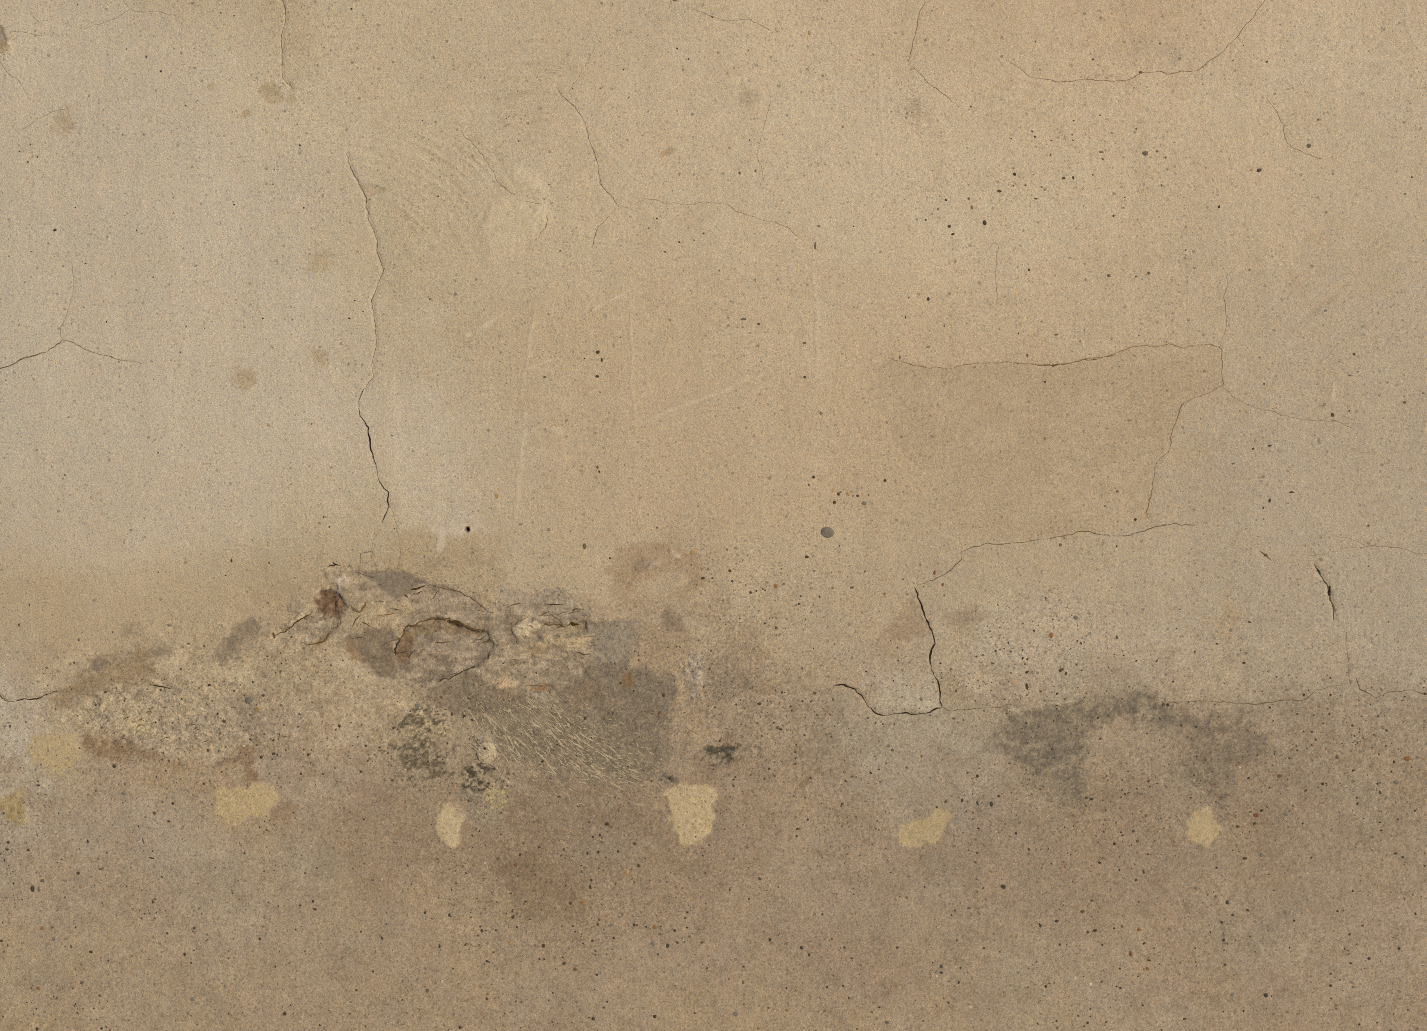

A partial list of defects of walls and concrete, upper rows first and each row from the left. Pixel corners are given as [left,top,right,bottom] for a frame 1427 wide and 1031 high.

crack [1009,2,1264,82]
crack [0,266,141,369]
crack [346,153,401,569]
crack [818,274,1355,716]
crack [0,691,58,702]
water stain [45,617,175,714]
water stain [79,683,287,812]
spalling [65,560,596,759]
water stain [269,531,883,971]
water stain [810,786,897,851]
water stain [985,682,1284,828]
crack [1175,535,1427,705]